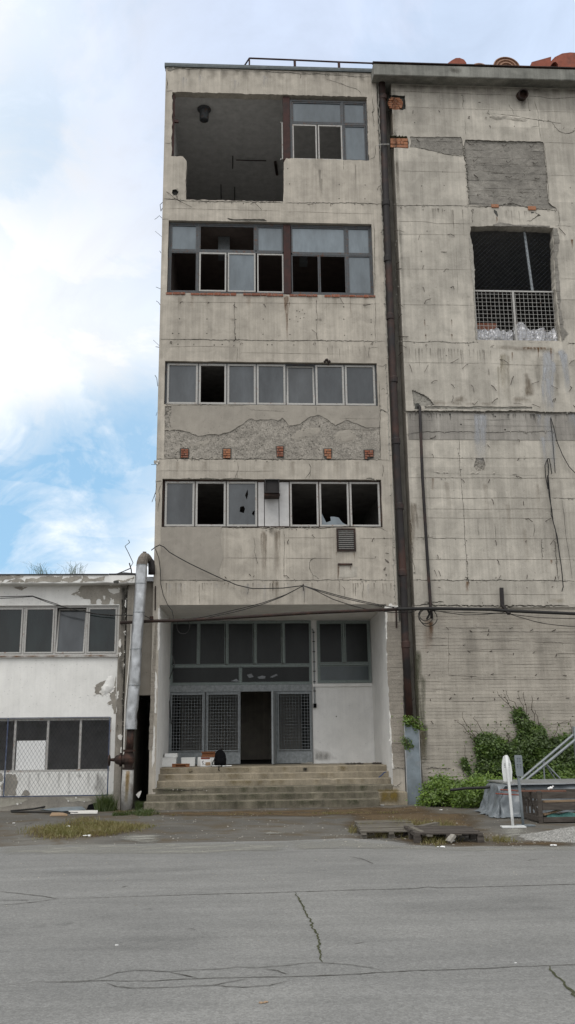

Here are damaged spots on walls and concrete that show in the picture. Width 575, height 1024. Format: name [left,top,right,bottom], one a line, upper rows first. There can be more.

spalling [410,136,557,217]
spalling [154,406,381,464]
peeling [0,575,134,607]
peeling [93,678,119,714]